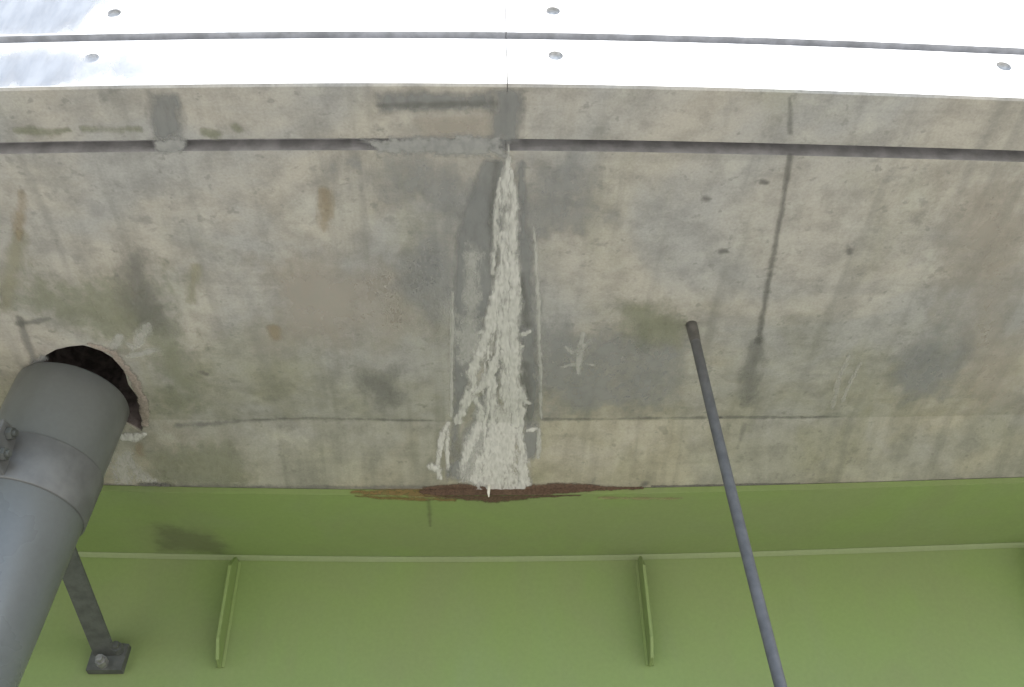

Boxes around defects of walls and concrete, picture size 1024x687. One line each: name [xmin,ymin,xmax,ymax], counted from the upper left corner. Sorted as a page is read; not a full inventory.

rust [350,483,644,503]
water stain [381,90,676,497]